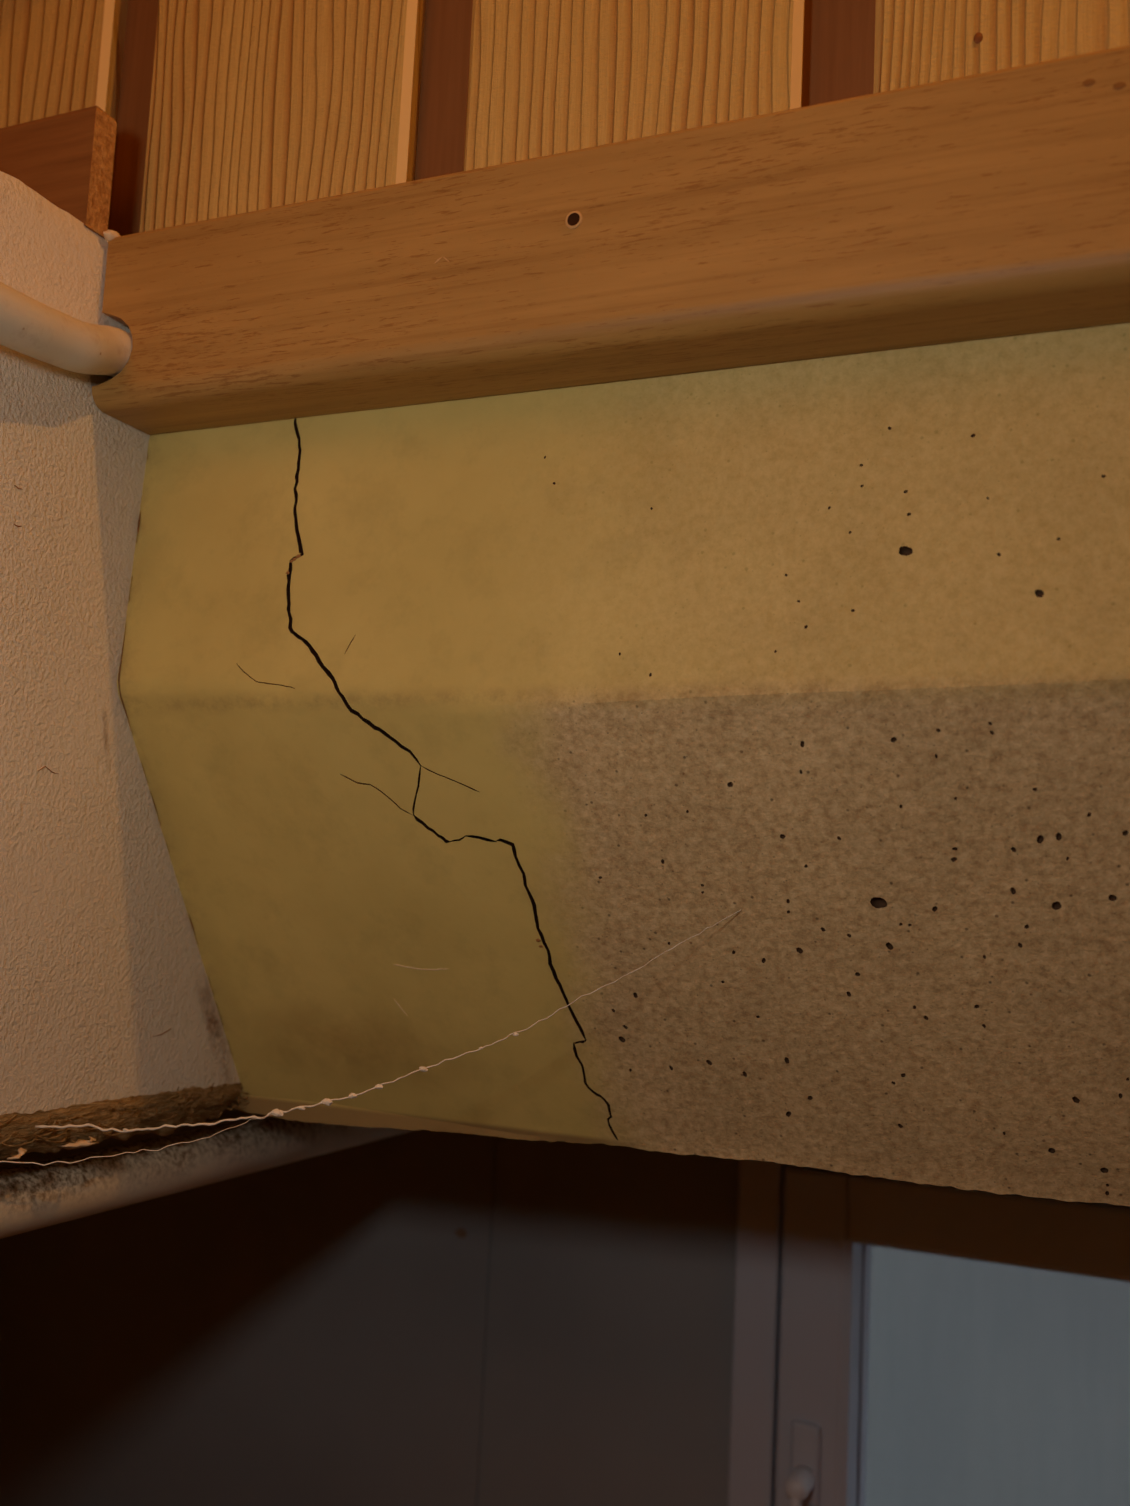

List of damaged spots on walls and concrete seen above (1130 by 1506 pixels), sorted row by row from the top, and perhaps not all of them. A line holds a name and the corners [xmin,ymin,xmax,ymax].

crack [236,418,618,1140]